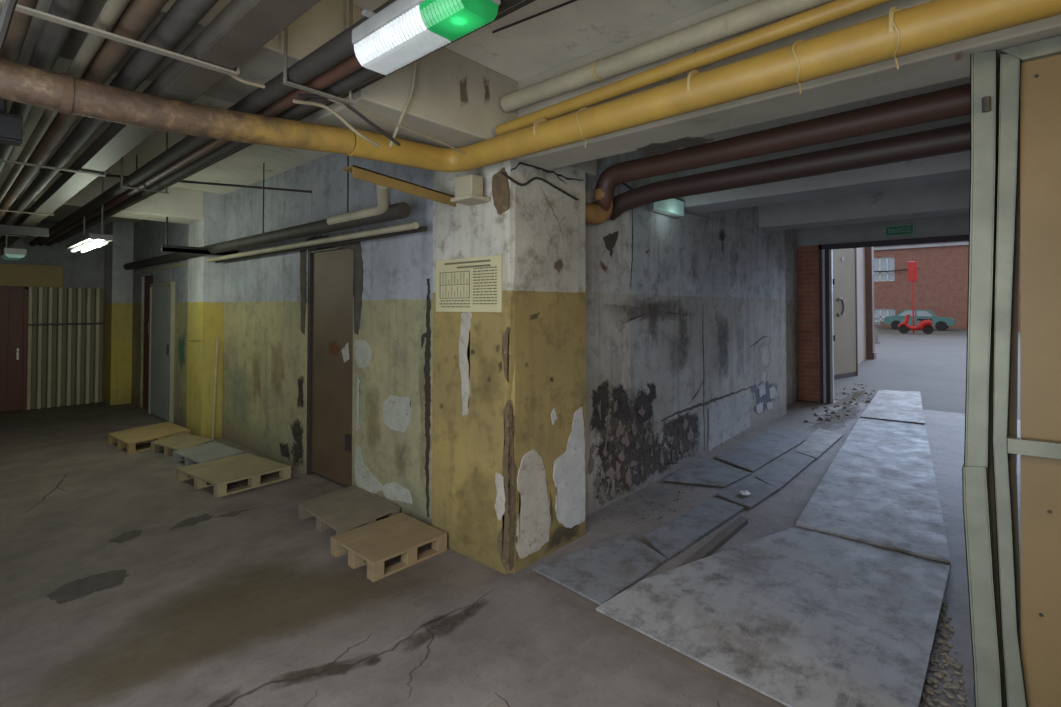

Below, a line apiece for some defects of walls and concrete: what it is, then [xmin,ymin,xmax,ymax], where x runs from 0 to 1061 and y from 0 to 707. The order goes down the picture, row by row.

spalling [499,326,510,382]
peeling [354,378,412,504]
peeling [495,400,697,572]
crack [223,680,286,707]
crack [304,590,493,707]